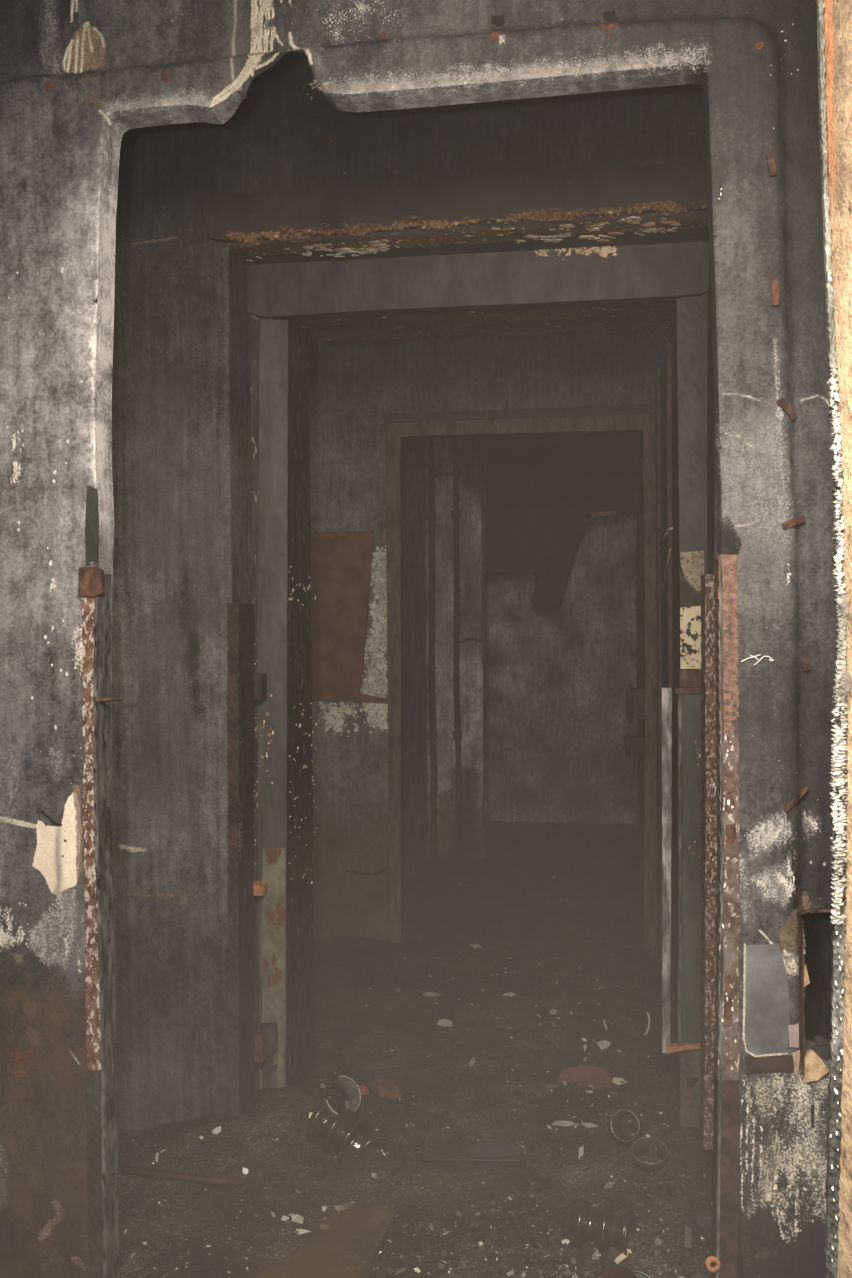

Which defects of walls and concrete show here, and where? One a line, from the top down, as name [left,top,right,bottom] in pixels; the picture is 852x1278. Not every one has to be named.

flaking render [63,21,105,74]
water stain [99,0,414,124]
water stain [307,43,708,97]
peeling [225,188,722,261]
peeling [289,546,388,785]
peeling [32,785,83,896]
corrosion [725,778,736,844]
peeling [0,902,31,967]
flaking render [779,891,811,987]
flaking render [726,931,843,1243]